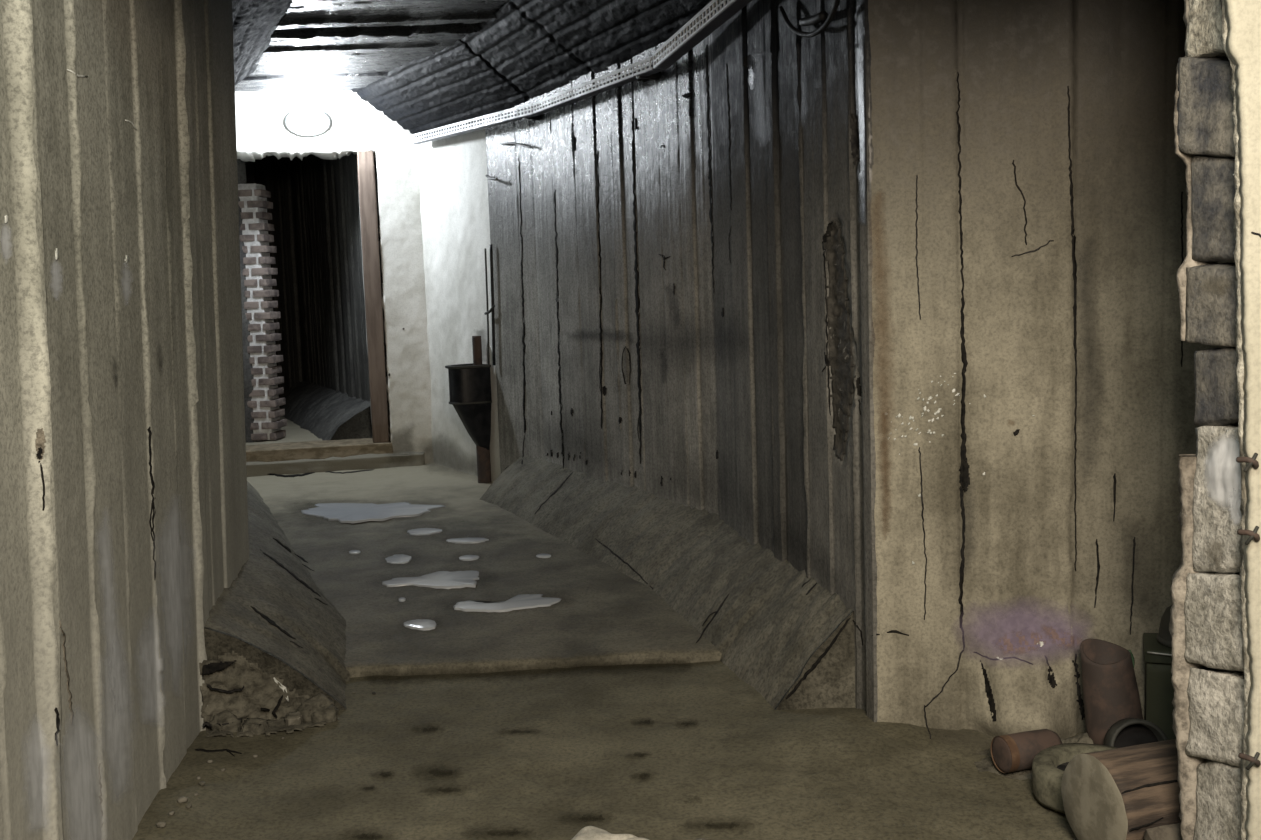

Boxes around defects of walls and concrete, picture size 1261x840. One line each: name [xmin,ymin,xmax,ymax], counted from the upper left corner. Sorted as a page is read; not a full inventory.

crack [914,175,922,320]
crack [1011,160,1054,257]
spalling [822,221,862,461]
crack [924,72,970,739]
crack [147,426,156,580]
crack [595,538,653,589]
crack [696,594,729,643]
crack [918,447,927,620]
spalling [199,651,339,737]